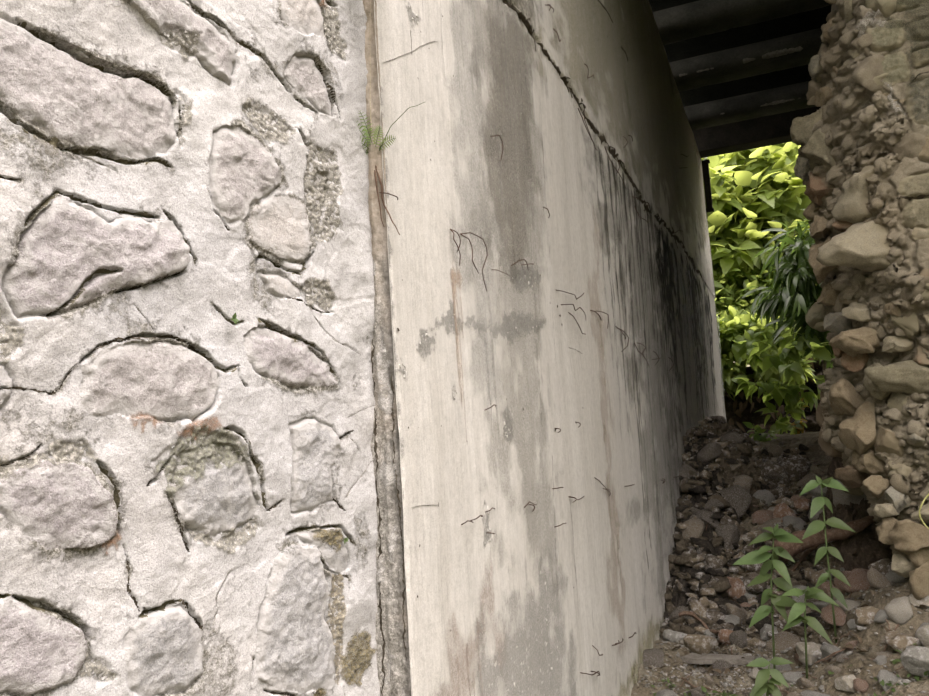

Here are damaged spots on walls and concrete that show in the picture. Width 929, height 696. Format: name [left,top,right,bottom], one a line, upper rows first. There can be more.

crack [247,244,306,275]
crack [216,297,439,696]
water stain [456,0,545,480]
crack [503,0,703,281]
water stain [596,152,721,510]